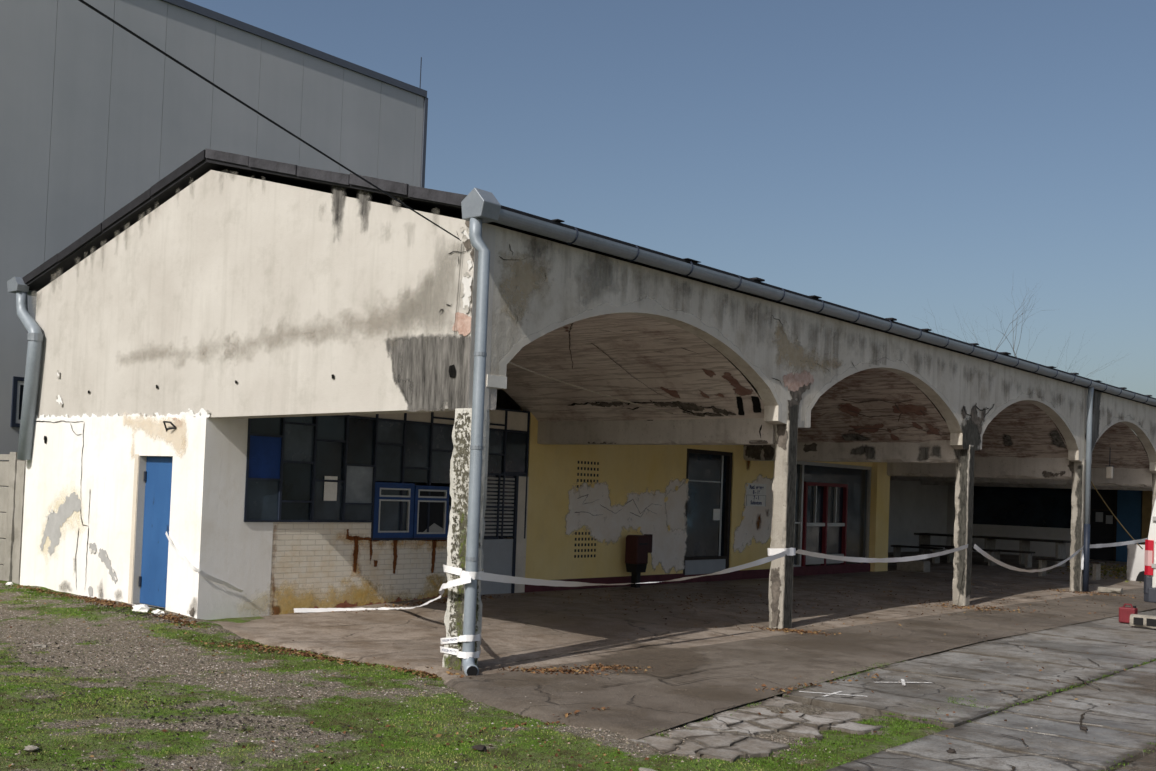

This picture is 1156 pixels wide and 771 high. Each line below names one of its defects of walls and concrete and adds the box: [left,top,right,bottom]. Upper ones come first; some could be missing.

leakage [333,186,371,228]
flaking render [452,220,474,336]
leakage [367,250,471,412]
flaking render [744,370,814,460]
peeling [40,492,81,556]
peeling [88,543,117,584]
corrosion [346,529,403,574]
spalling [334,412,480,671]
corrosion [418,540,447,573]
peeling [566,479,689,573]
peeling [733,474,774,552]
leakage [444,656,461,670]